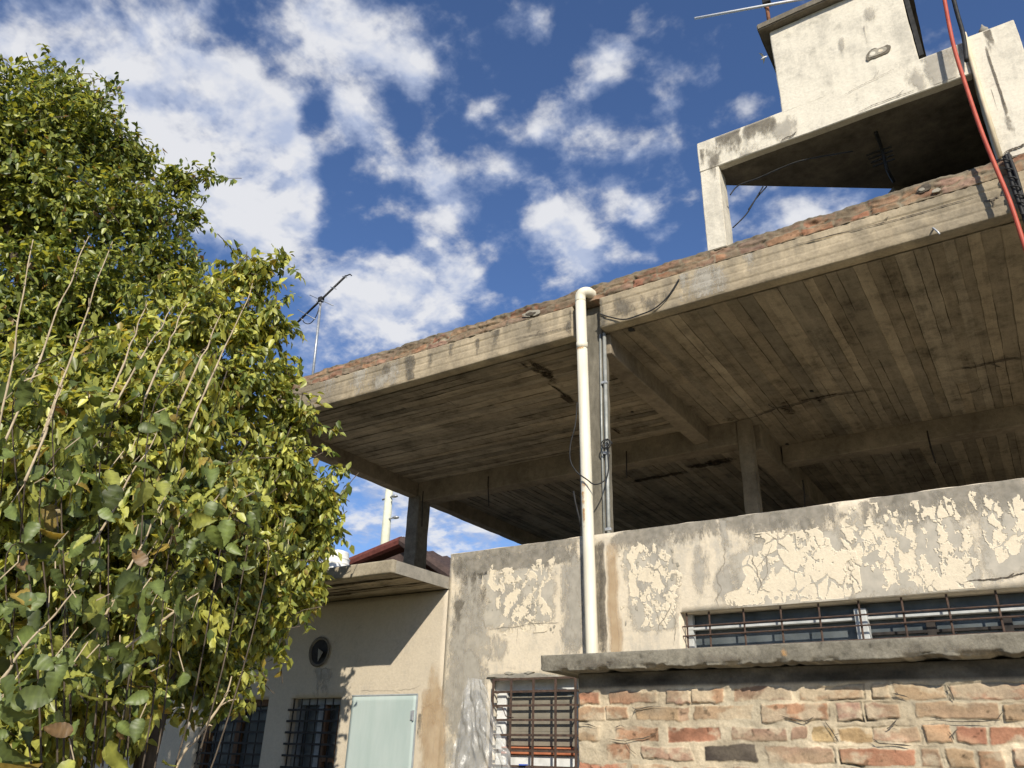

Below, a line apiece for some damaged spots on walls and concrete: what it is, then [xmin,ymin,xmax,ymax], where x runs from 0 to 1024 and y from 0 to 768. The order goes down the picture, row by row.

peeling [482,556,556,635]
leakage [417,505,846,768]
peeling [619,536,682,631]
peeling [725,491,1024,608]